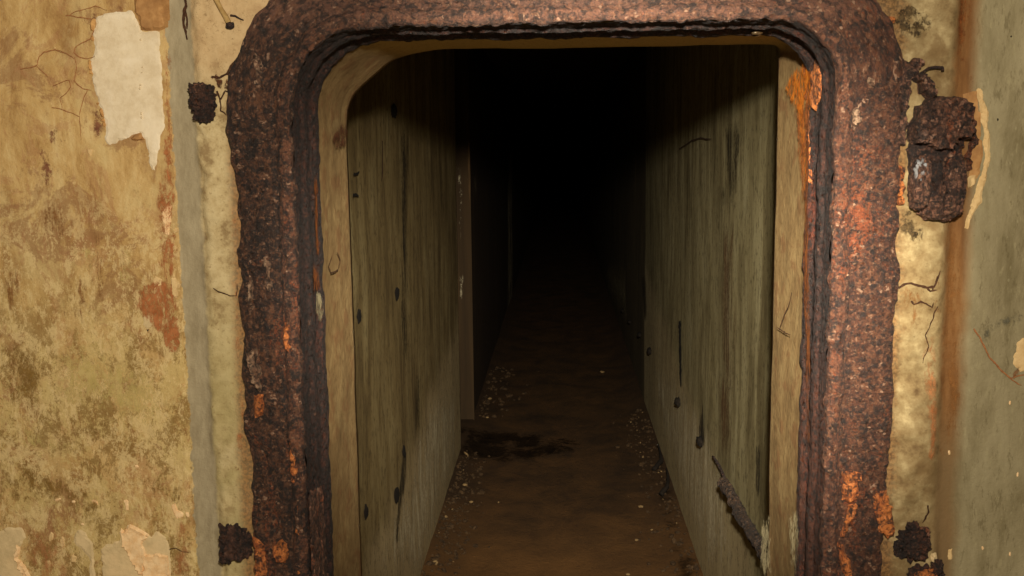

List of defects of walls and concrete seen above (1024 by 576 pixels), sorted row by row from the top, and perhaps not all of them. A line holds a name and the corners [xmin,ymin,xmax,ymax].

crack [21,5,103,134]
flaking render [88,10,165,170]
flaking render [963,88,991,229]
corrosion [137,103,180,352]
corrosion [786,67,811,404]
crack [899,271,941,361]
crack [973,328,1024,385]
flaking render [0,527,30,576]
flaking render [45,523,171,576]